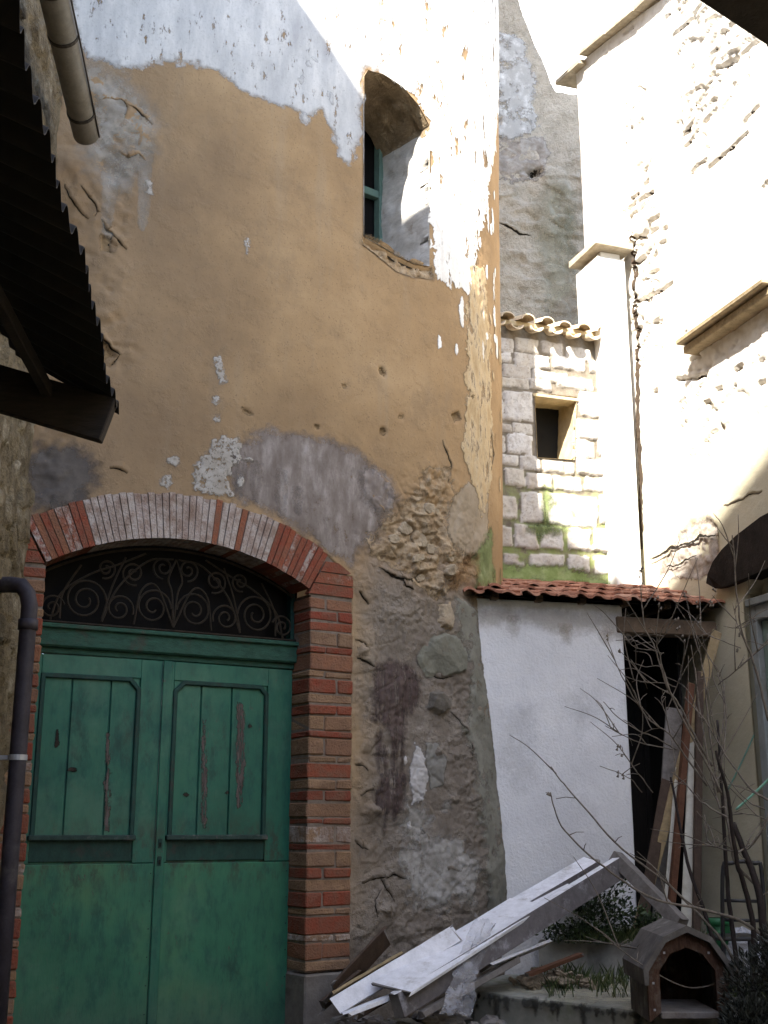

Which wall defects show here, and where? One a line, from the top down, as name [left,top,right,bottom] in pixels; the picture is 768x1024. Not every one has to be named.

crack [499,220,531,236]
peeling [72,0,551,678]
water stain [29,442,99,510]
crack [650,533,719,567]
peeling [404,742,429,805]
water stain [372,661,480,908]
crack [354,759,411,917]